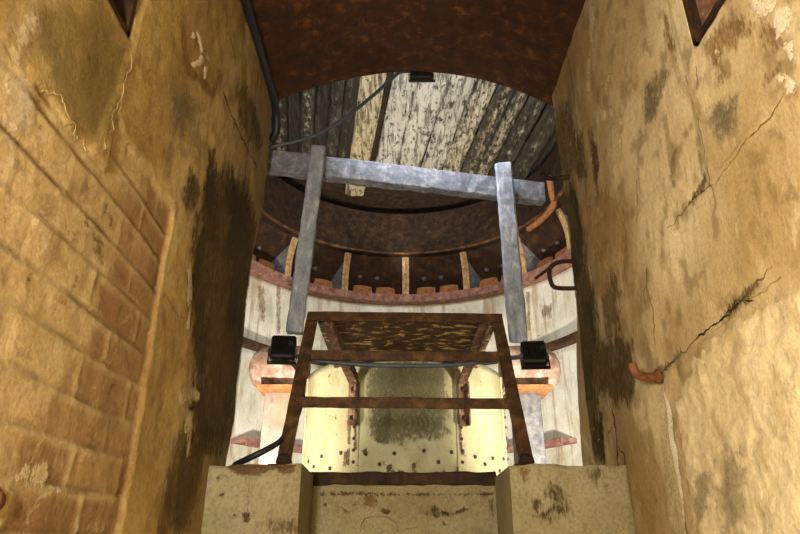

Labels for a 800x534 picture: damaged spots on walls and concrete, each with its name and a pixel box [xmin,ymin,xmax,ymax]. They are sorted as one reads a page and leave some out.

peeling [191,32,210,80]
peeling [749,0,795,61]
peeling [775,73,796,95]
crack [668,68,783,227]
leakage [157,147,257,534]
leakage [556,101,635,484]
crack [662,266,781,372]
leakage [657,352,687,534]
leakage [532,481,568,523]